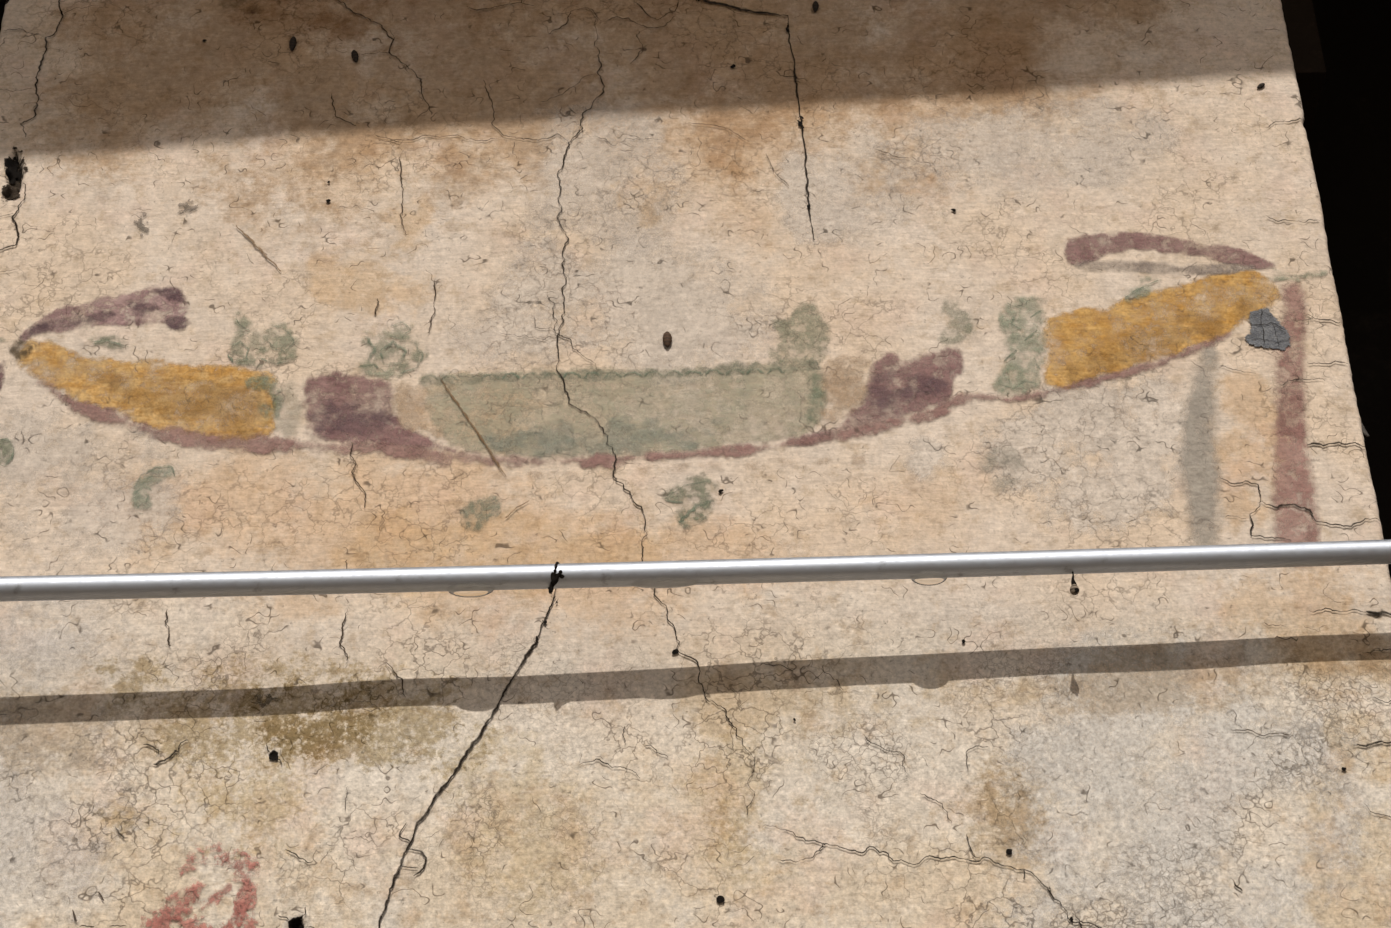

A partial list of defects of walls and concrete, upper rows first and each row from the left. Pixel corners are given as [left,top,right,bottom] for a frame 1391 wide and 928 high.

crack [1,0,94,137]
crack [0,183,26,272]
crack [331,0,1101,928]